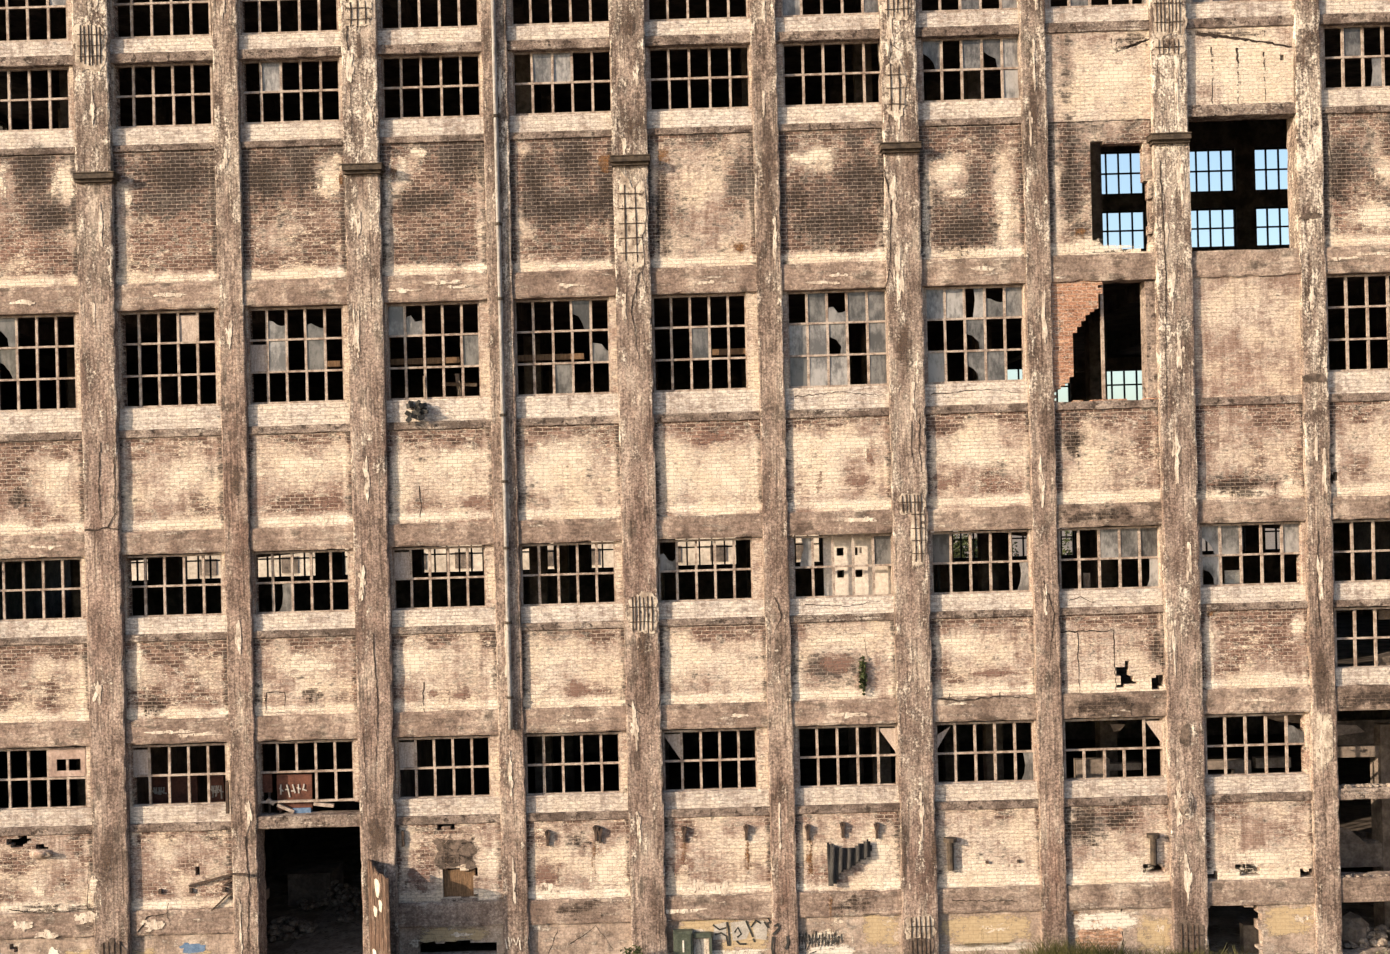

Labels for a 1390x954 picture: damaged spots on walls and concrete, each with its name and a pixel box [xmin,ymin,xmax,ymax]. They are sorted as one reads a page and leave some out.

water stain [0,143,76,229]
water stain [759,147,889,267]
water stain [922,156,1017,259]
peeling [405,838,478,893]